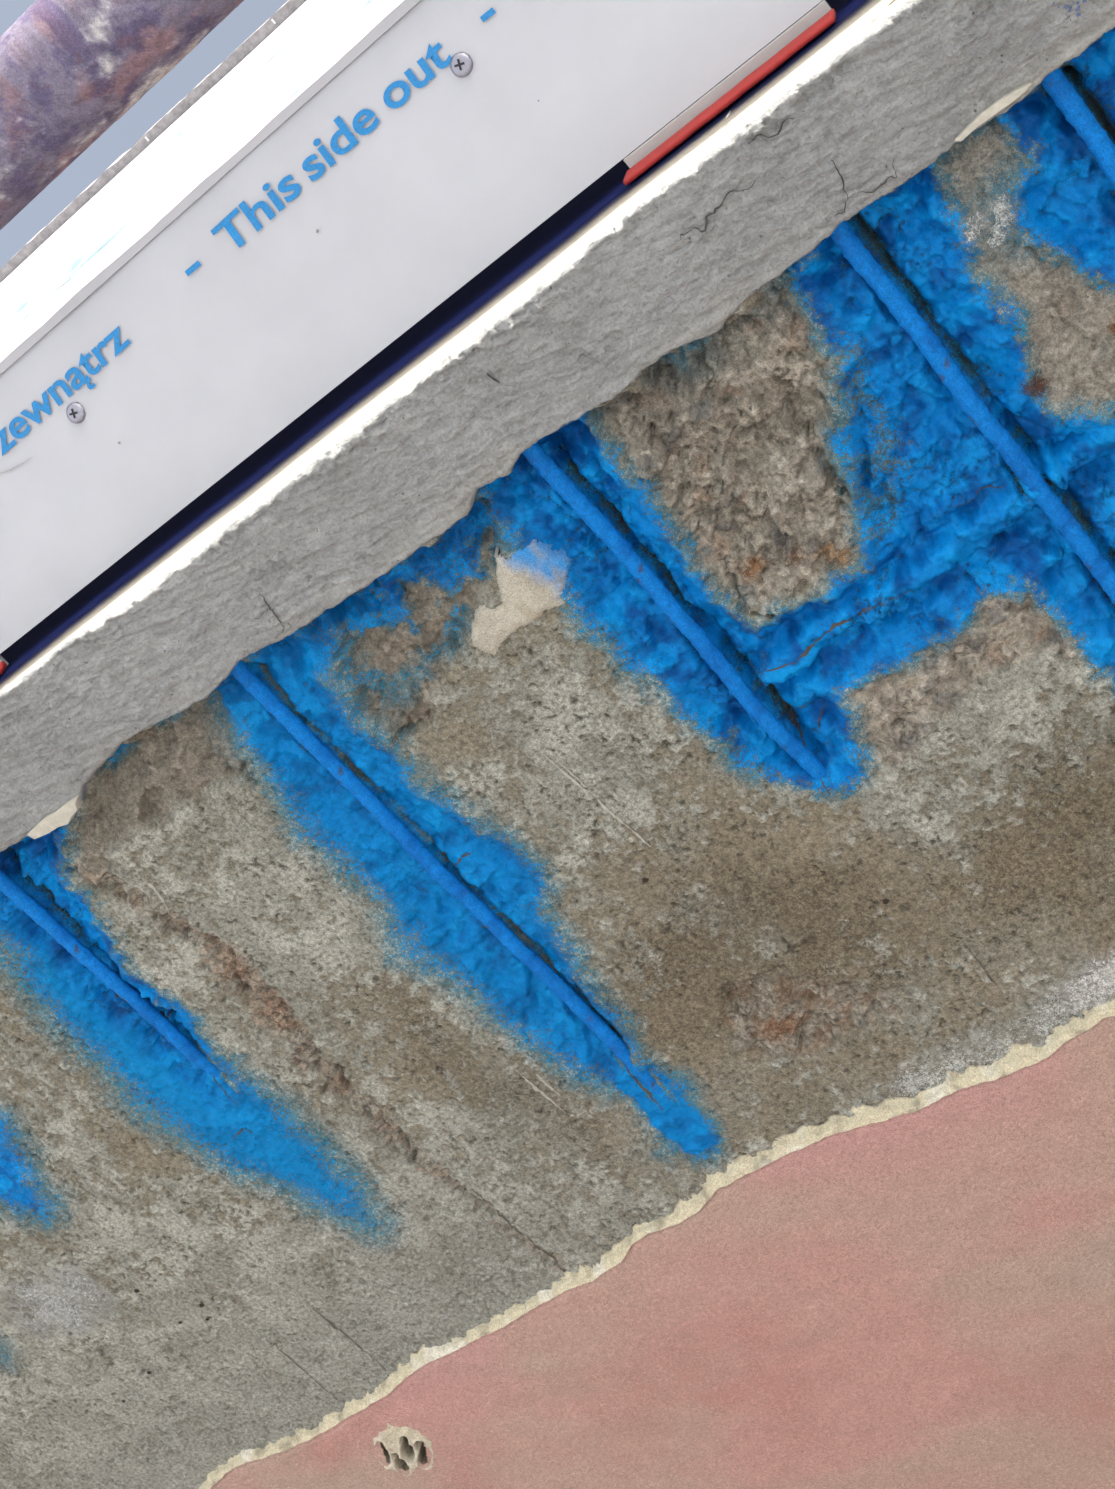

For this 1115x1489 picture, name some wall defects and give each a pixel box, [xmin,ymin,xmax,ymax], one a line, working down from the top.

crack [675,180,756,242]
crack [746,118,794,145]
spalling [995,27,1115,290]
spalling [0,82,1115,1243]
spalling [199,997,1115,1489]